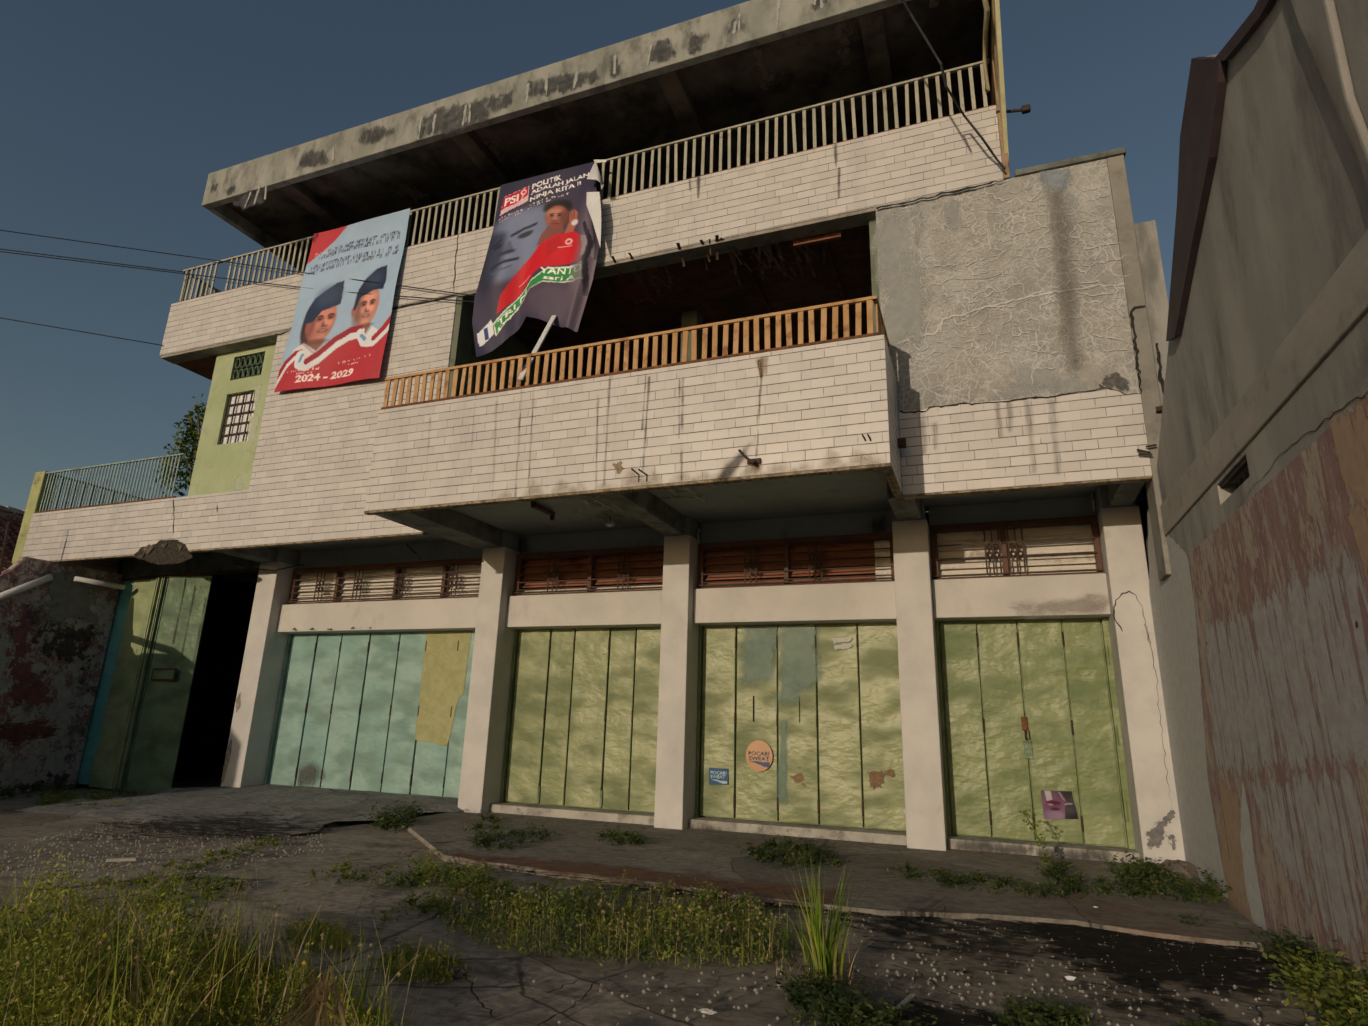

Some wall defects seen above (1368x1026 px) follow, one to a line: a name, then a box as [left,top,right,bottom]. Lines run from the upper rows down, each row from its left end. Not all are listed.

leakage [647,34,706,66]
leakage [417,54,620,139]
leakage [300,148,334,167]
leakage [361,126,394,144]
leakage [1040,168,1073,202]
leakage [873,204,924,344]
crack [876,178,1164,413]
crack [1237,391,1368,508]
crack [1113,591,1172,807]
spalling [1146,810,1177,850]
crack [465,975,501,1020]
crack [537,966,639,1026]